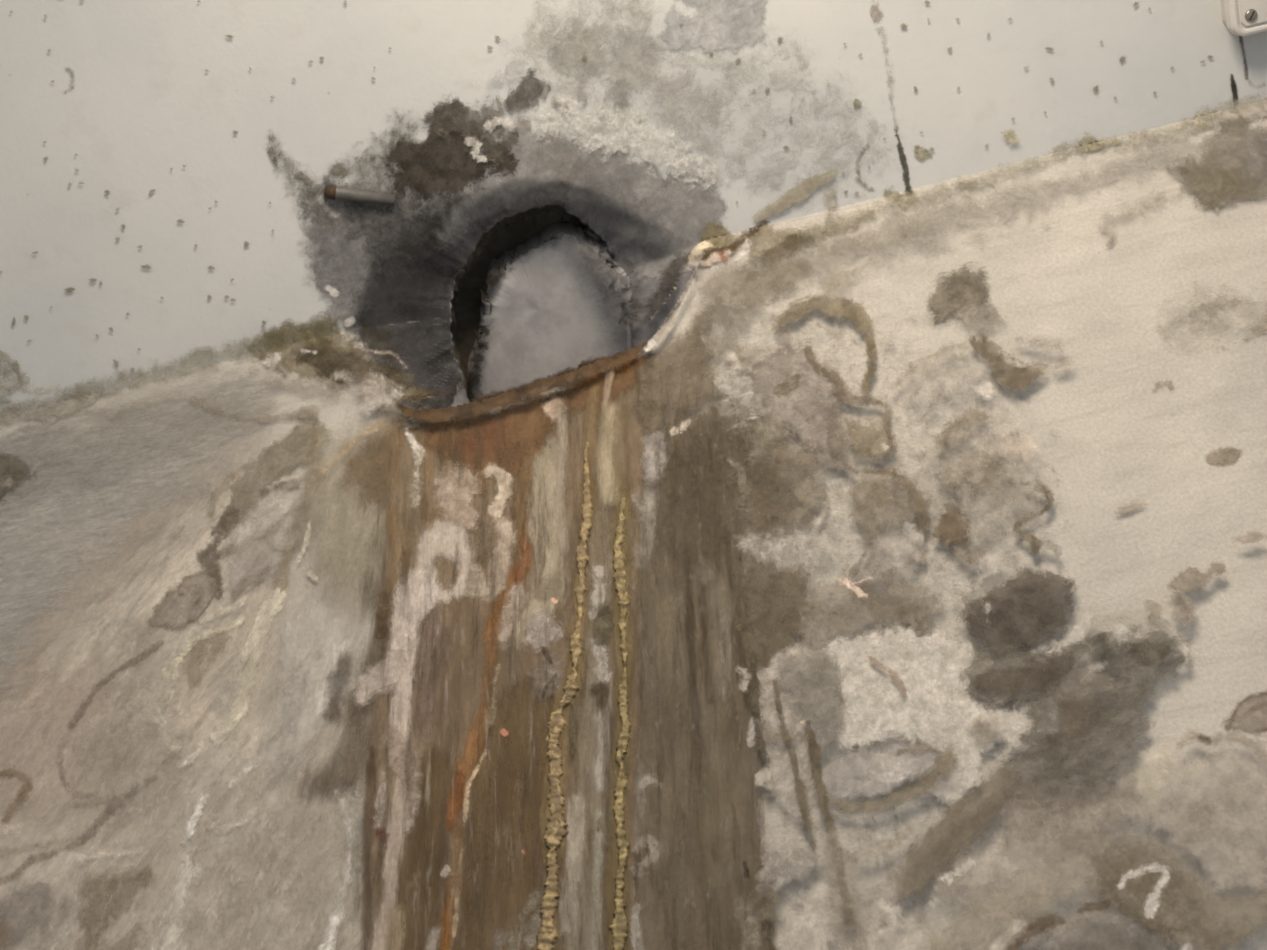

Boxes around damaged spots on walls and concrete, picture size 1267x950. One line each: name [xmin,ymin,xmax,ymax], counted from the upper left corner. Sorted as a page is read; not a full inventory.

damp [0,0,880,950]
corrosion [308,341,655,950]
spalling [388,200,703,410]
crack [871,5,893,85]
crack [858,125,932,210]
damp [629,116,1267,950]